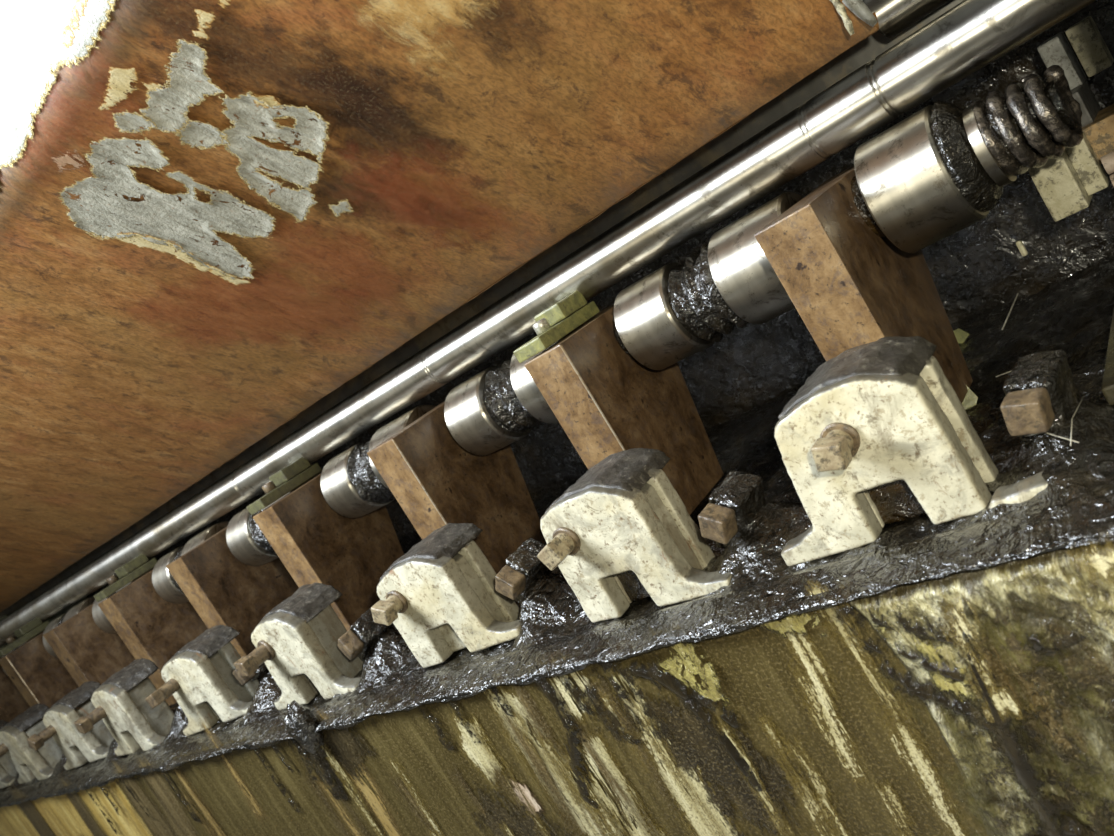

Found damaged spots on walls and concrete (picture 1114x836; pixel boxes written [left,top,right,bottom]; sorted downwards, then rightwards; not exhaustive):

corrosion [359,0,513,71]
peeling [0,0,116,169]
peeling [52,0,353,286]
corrosion [327,178,446,224]
leakage [9,787,56,836]
leakage [61,779,108,836]
leakage [110,759,225,836]
leakage [317,745,400,836]
leakage [390,759,443,836]
leakage [452,671,740,836]
leakage [714,717,849,836]
leakage [780,604,966,836]